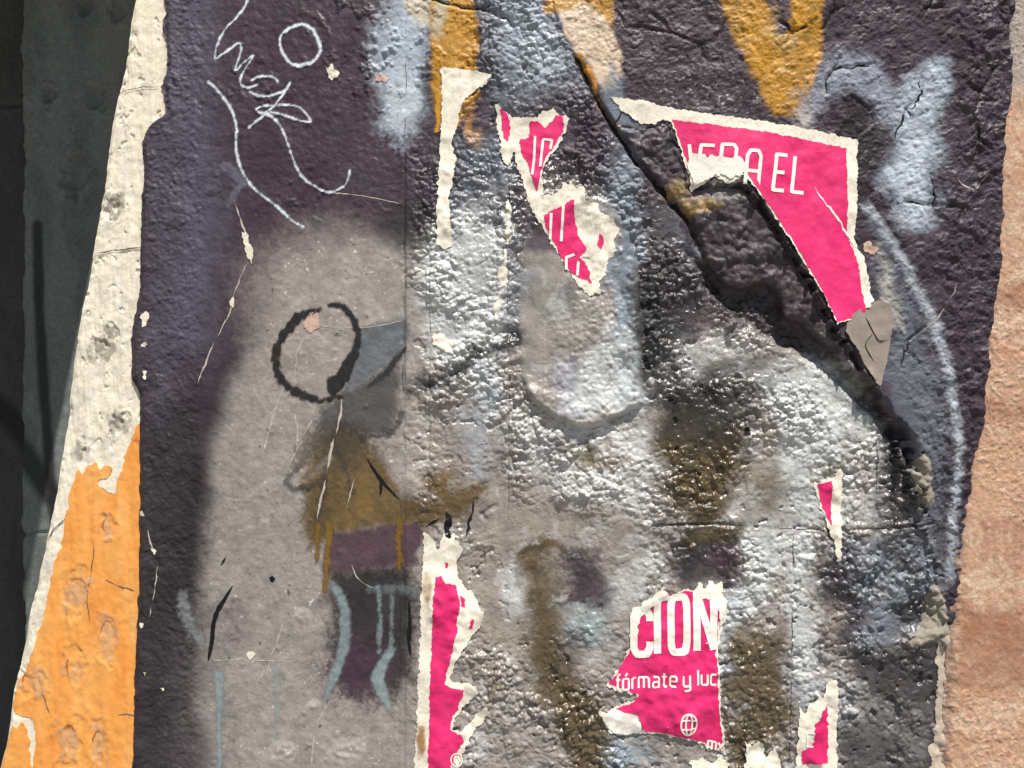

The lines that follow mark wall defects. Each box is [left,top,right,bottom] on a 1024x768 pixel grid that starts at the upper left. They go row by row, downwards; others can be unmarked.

crack [575,56,701,248]
crack [825,58,870,92]
crack [856,81,923,138]
peeling [493,249,508,317]
flaking render [614,125,895,390]
peeling [1,423,156,768]